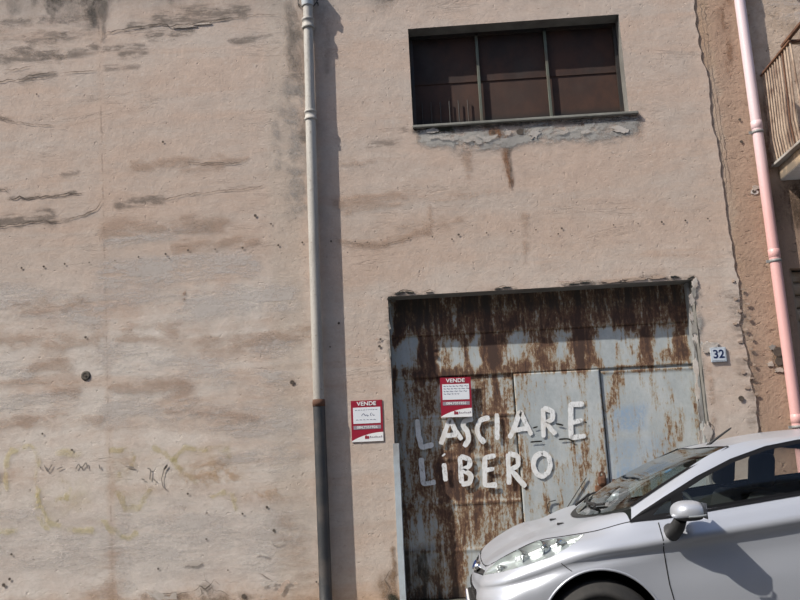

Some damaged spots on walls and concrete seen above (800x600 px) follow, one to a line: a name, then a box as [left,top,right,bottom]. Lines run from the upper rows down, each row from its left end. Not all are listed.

flaking render [419,118,638,150]
corrosion [504,137,513,186]
spalling [559,275,714,444]